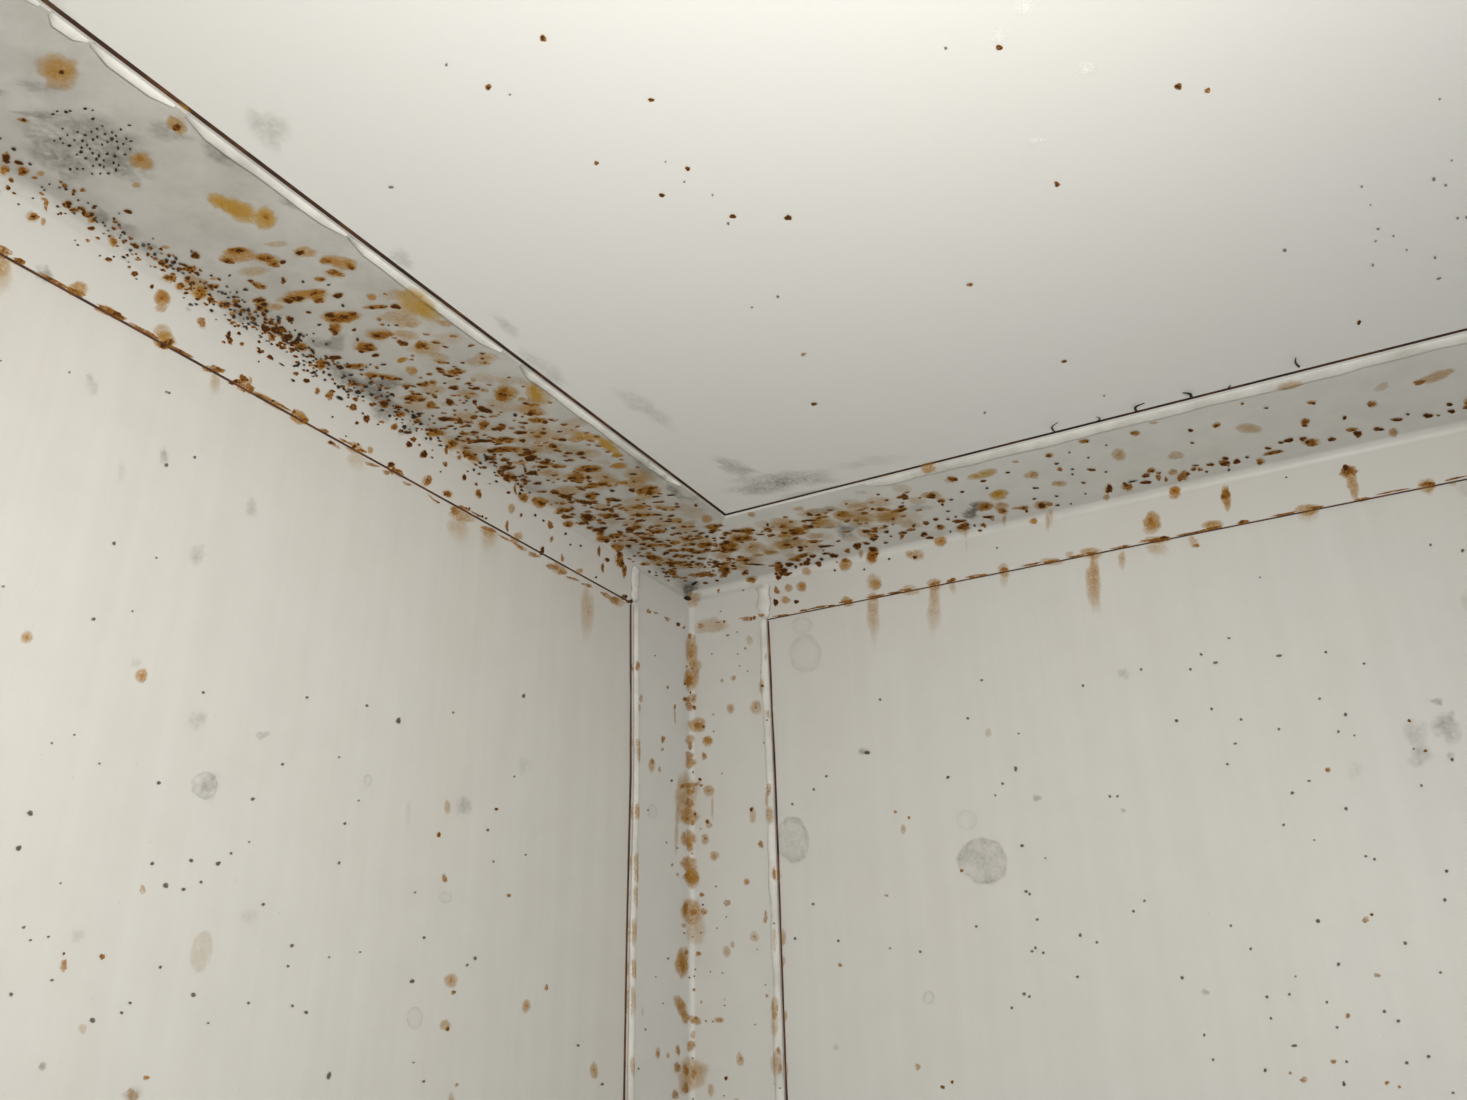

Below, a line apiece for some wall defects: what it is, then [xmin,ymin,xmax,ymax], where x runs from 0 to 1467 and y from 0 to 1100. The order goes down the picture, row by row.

water stain [51,107,133,175]